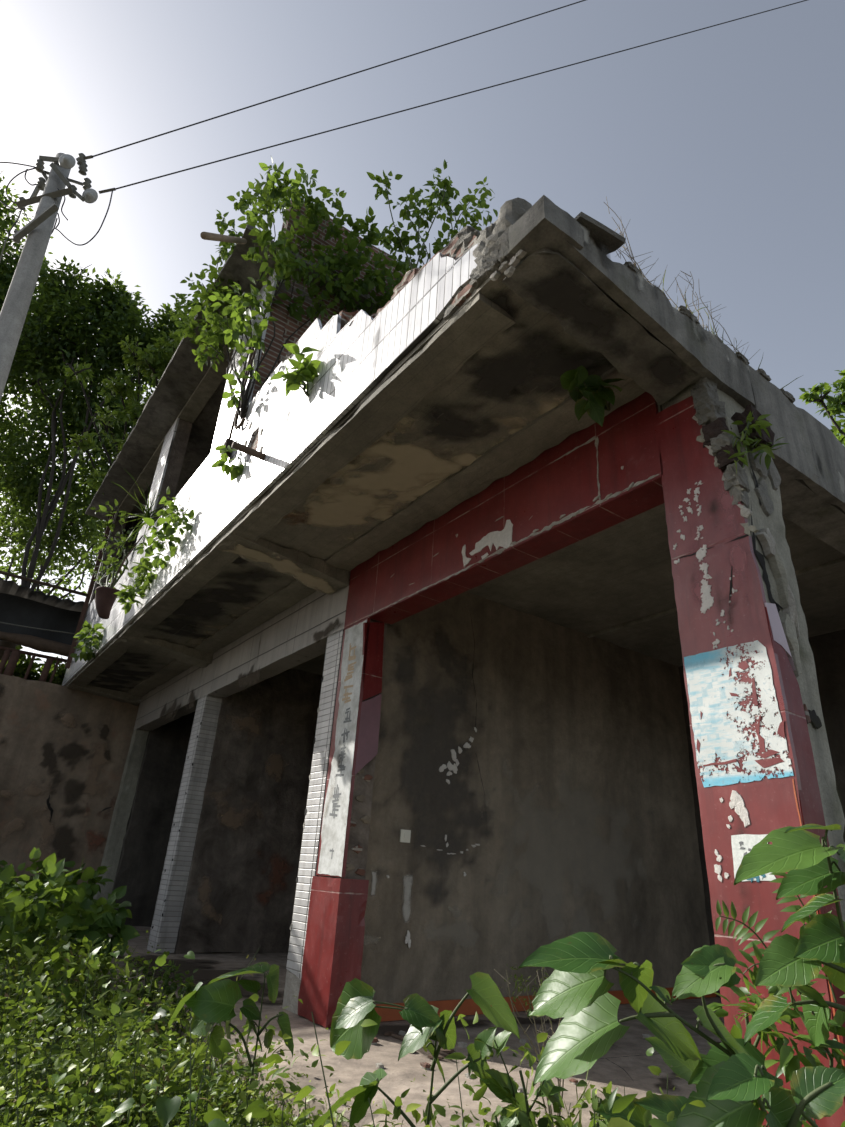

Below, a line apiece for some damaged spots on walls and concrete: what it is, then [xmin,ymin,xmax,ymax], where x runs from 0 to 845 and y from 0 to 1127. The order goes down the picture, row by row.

spalling [339,268,421,327]
spalling [443,195,626,321]
leakage [469,273,625,415]
leakage [160,545,334,645]
leakage [238,666,260,686]
leakage [313,618,341,642]
leakage [306,406,526,540]
peeling [369,436,659,616]
peeling [673,480,738,649]
leakage [40,742,89,872]
peeling [714,849,729,882]
peeling [719,790,750,829]